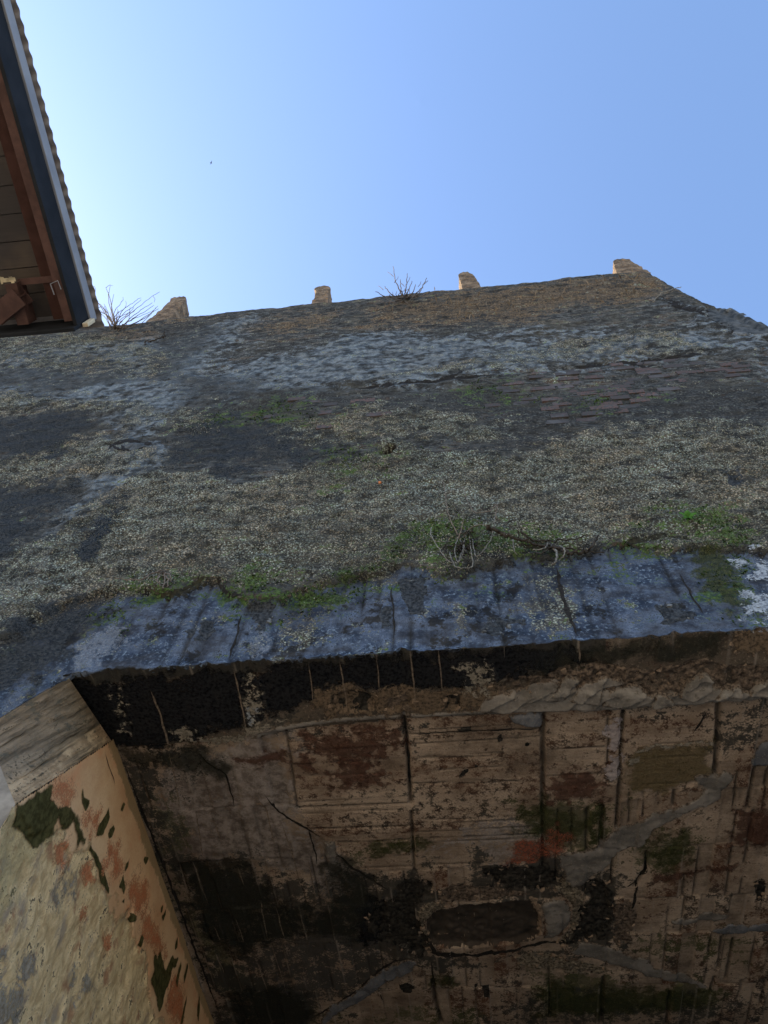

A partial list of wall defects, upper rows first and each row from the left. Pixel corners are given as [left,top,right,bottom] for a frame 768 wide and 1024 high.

water stain [0,408,115,465]
water stain [159,413,332,478]
water stain [0,469,82,575]
water stain [74,495,130,562]
water stain [71,632,730,780]
crack [106,757,221,1017]
water stain [169,855,388,960]
crack [267,798,388,904]
spalling [364,859,563,958]
crack [627,850,648,911]
crack [309,939,559,1020]